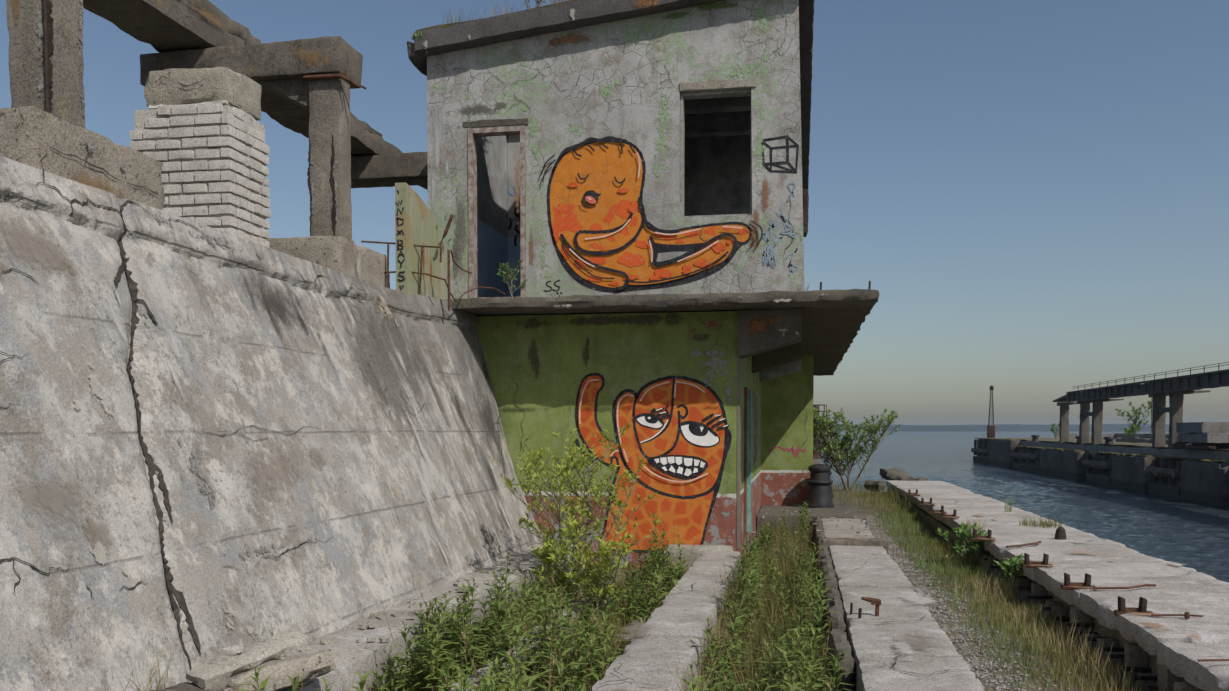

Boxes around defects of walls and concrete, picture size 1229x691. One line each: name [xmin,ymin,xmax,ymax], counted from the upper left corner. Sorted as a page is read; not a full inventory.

crack [0,147,227,683]